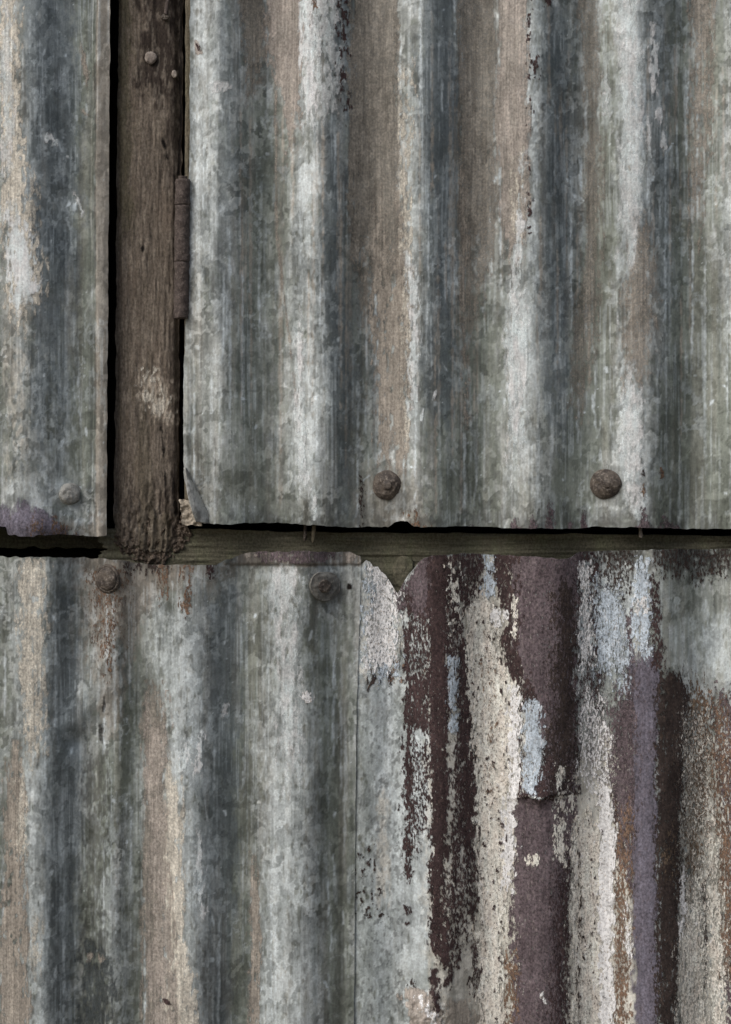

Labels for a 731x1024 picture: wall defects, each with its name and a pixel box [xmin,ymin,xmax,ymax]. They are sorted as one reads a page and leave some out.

corrosion [86,561,216,684]
corrosion [355,844,389,923]
peeling [396,555,655,1024]
corrosion [366,549,731,1024]
peeling [671,706,731,1024]